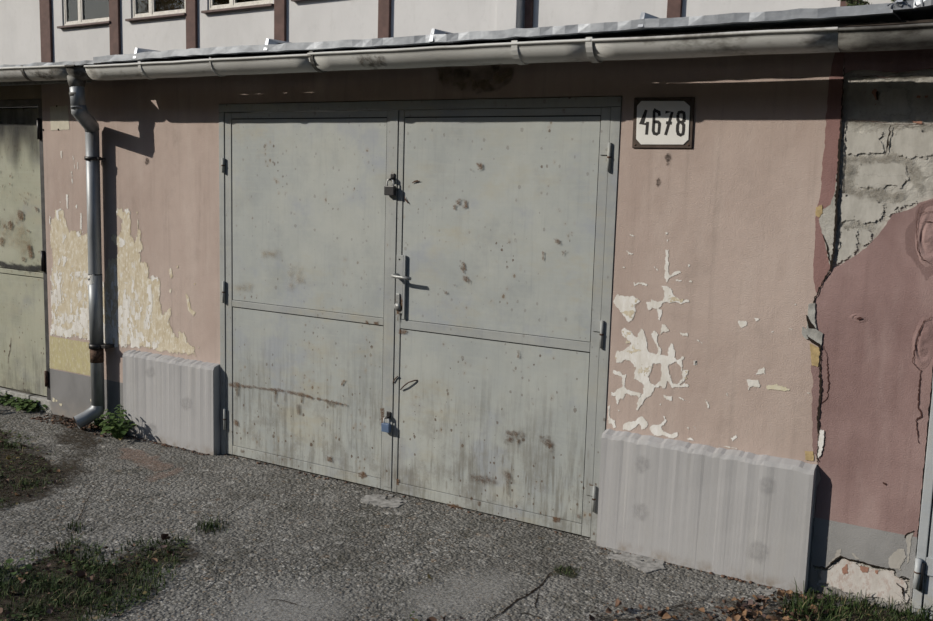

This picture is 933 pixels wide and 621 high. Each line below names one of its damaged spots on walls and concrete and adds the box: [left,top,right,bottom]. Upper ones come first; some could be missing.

crack [813,67,927,303]
flaking render [815,69,933,269]
peeling [49,194,91,376]
peeling [102,208,199,357]
rust [230,382,346,413]
peeling [608,232,697,441]
peeling [747,367,790,391]
crack [816,346,830,462]
crack [487,570,557,621]
flaking render [814,533,913,606]